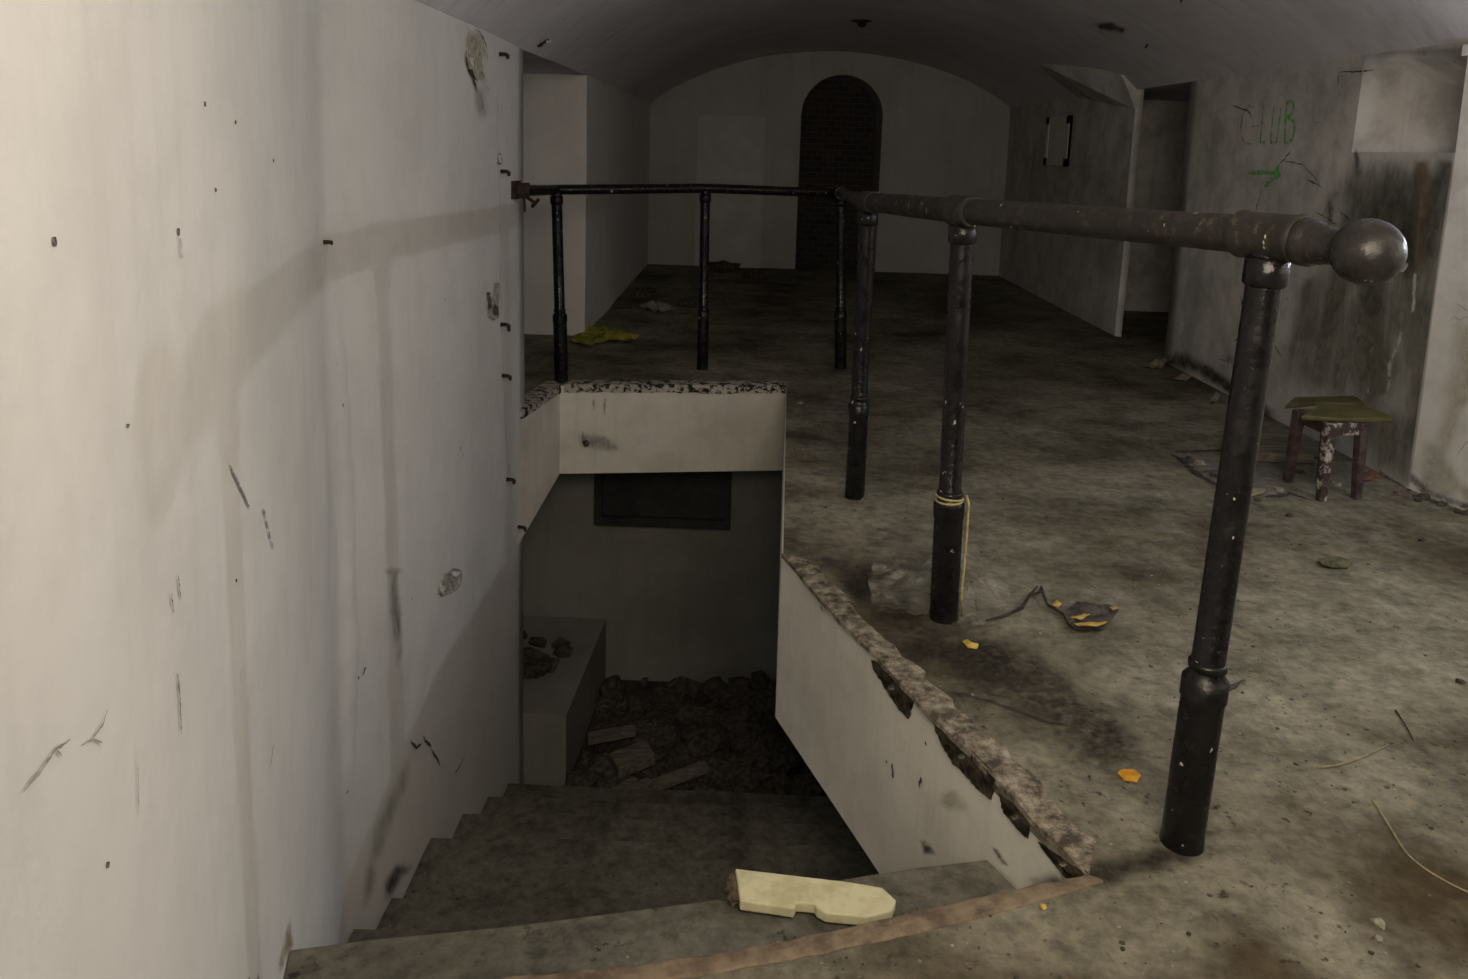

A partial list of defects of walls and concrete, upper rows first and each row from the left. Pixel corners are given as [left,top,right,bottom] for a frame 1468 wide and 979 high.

spalling [466,30,489,109]
water stain [1293,164,1468,507]
spalling [438,567,462,597]
spalling [871,660,914,719]
crack [23,710,108,793]
spalling [925,721,1088,879]